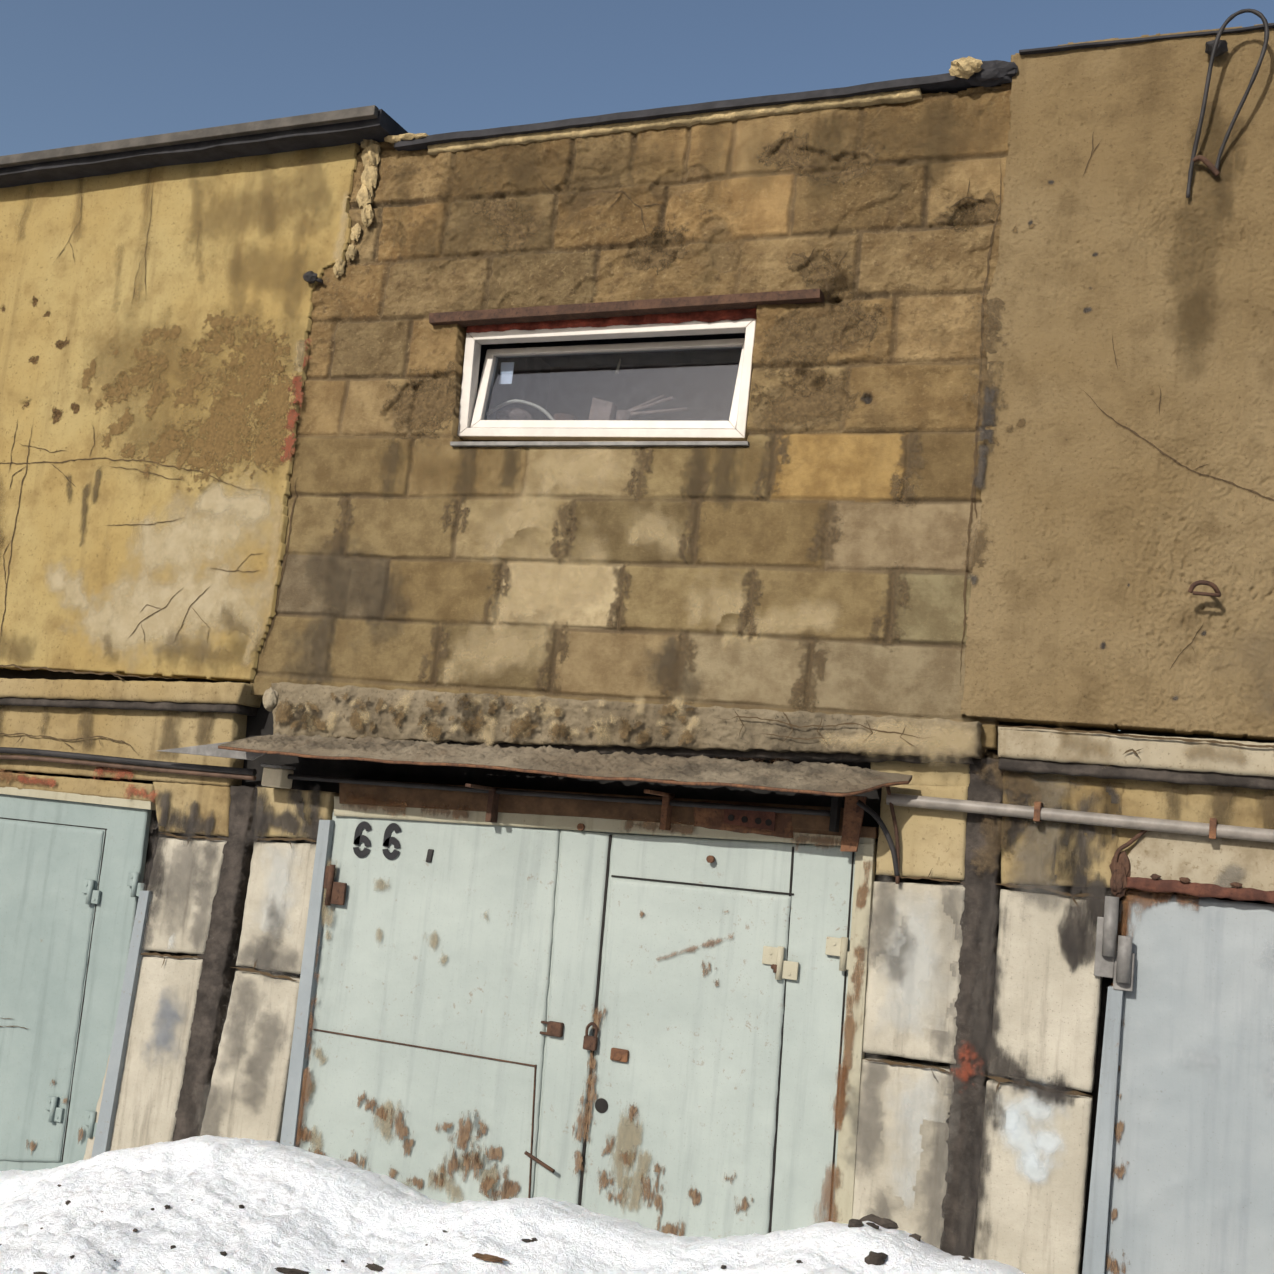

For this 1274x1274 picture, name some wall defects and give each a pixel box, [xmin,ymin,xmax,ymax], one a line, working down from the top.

spalling [52,402,80,424]
peeling [82,311,311,492]
crack [1081,389,1274,501]
crack [0,418,298,680]
crack [1170,625,1203,669]
rust [357,1091,414,1155]
rust [389,1110,520,1201]
rust [572,1051,597,1175]
rust [599,1138,636,1204]
rust [640,1162,685,1236]
rust [688,1189,701,1206]
water stain [954,881,1072,1258]